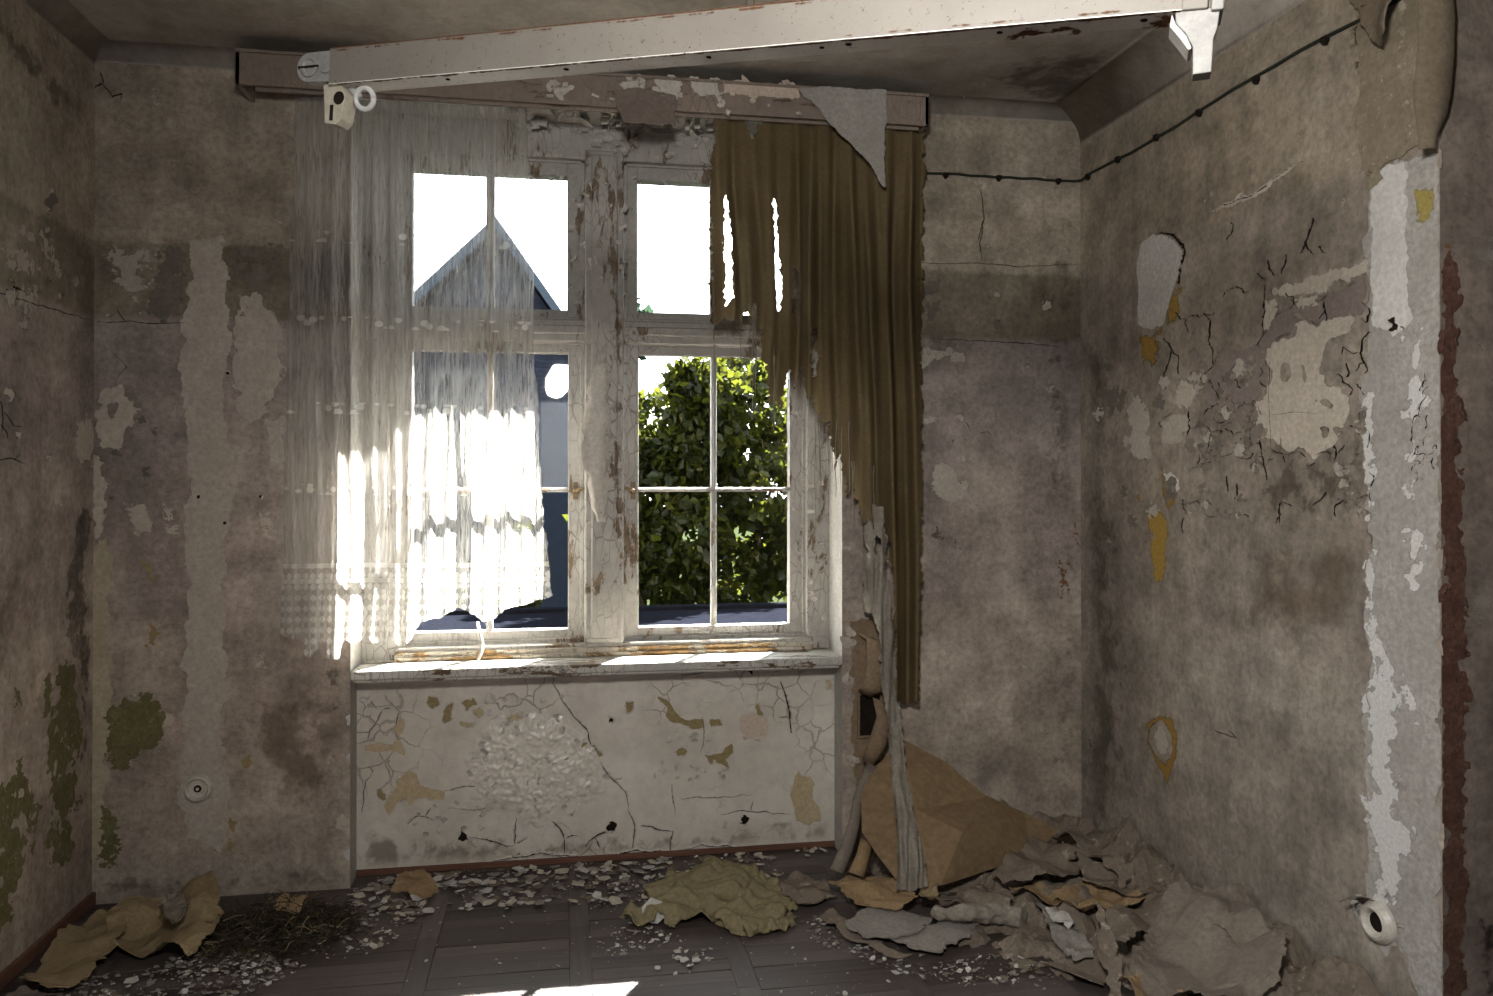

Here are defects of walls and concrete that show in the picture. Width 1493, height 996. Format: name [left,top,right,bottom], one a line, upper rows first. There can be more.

peeling [506,73,770,185]
flaking render [0,184,81,315]
flaking render [160,235,246,852]
flaking render [1123,148,1445,996]
flaking render [92,448,152,865]
peeling [346,714,488,849]
peeling [426,694,564,735]
crack [357,677,793,861]
flaking render [604,821,617,834]
peeling [654,696,768,781]
peeling [790,771,821,825]
peeling [31,852,786,996]